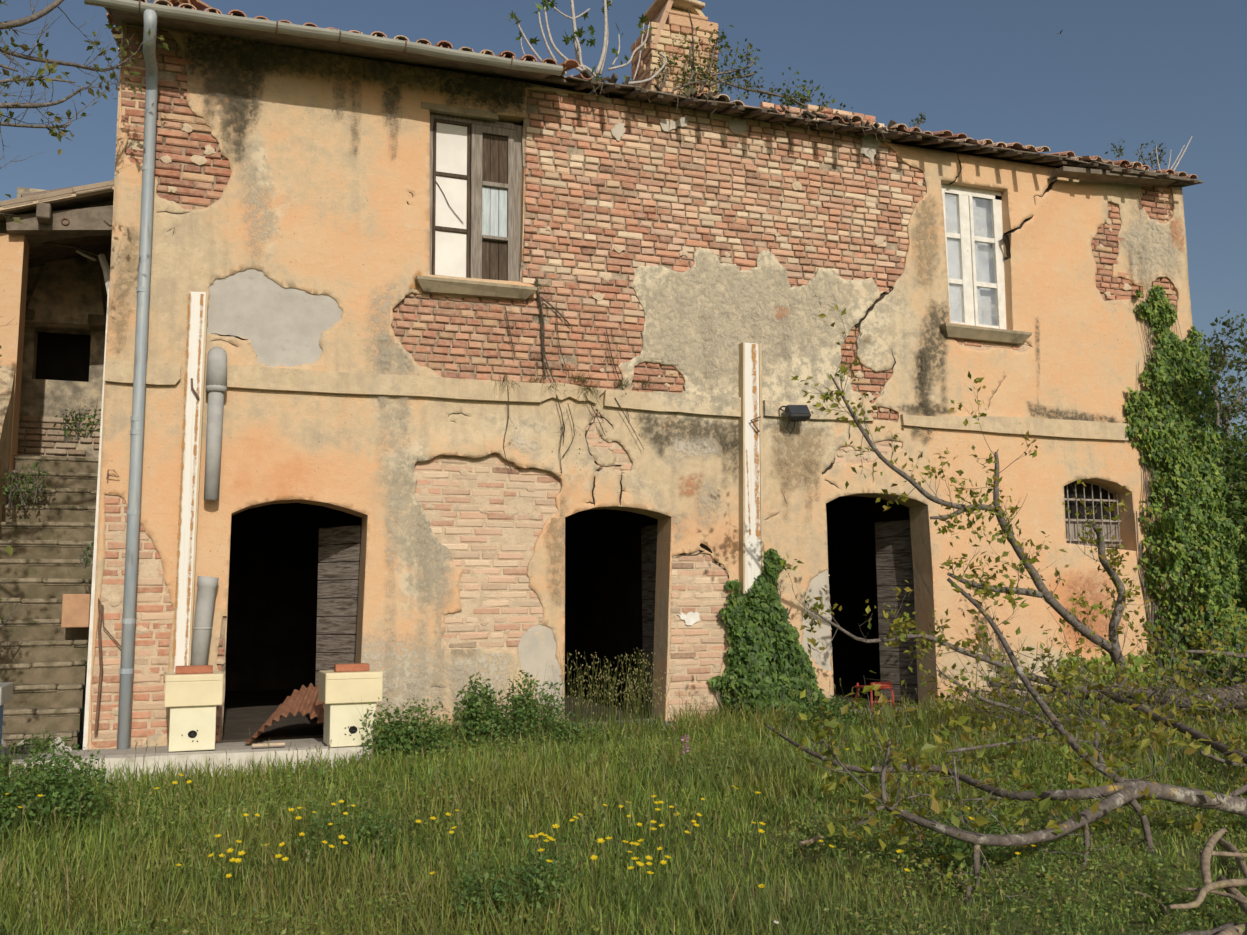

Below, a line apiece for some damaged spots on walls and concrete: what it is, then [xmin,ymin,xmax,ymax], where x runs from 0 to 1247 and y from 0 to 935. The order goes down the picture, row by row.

peeling [119,24,231,209]
damp [188,34,531,253]
peeling [391,91,926,393]
crack [1002,165,1066,259]
peeling [1091,202,1177,314]
peeling [1138,184,1173,223]
peeling [206,268,343,367]
peeling [840,325,898,422]
peeling [832,440,902,464]
peeling [414,453,563,715]
peeling [667,551,729,721]